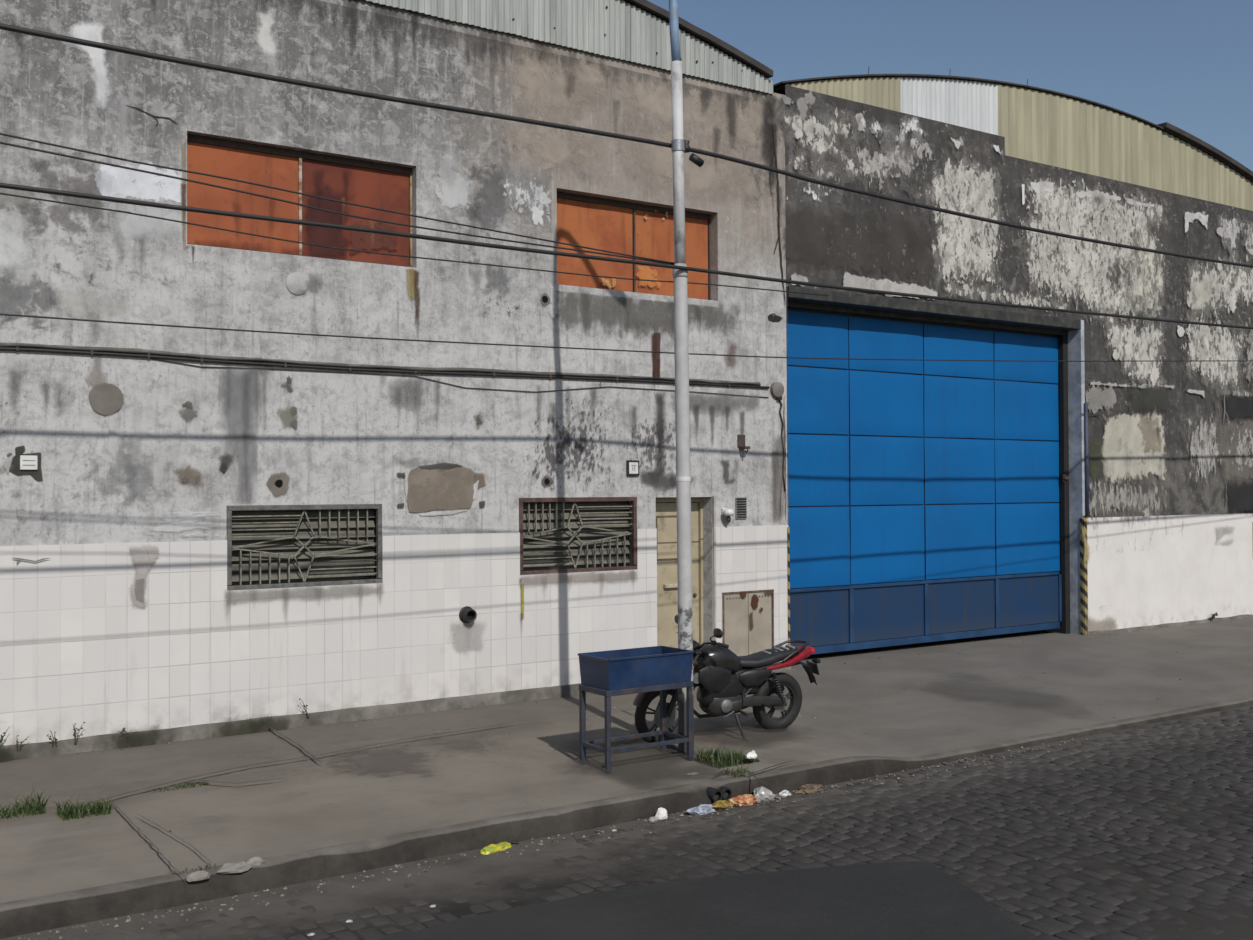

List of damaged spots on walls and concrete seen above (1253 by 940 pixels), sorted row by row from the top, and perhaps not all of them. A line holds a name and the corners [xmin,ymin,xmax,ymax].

rust [407,269,420,320]
leakage [557,291,734,336]
peeling [627,78,1253,524]
rust [652,332,661,378]
leakage [224,369,259,501]
leakage [511,382,676,496]
leakage [689,396,757,435]
spalling [397,463,486,516]
peeling [153,511,216,536]
spalling [130,546,159,608]